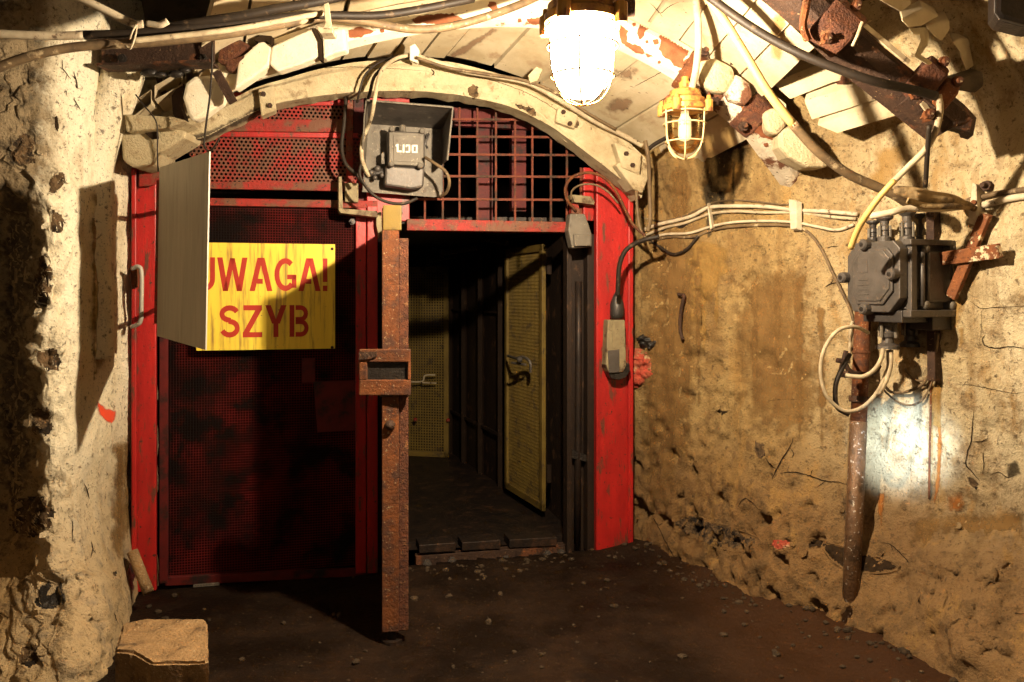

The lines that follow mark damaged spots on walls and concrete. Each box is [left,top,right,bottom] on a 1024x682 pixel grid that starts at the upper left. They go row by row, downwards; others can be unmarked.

crack [767,439,847,486]
corrosion [932,384,942,502]
crack [962,384,1024,481]